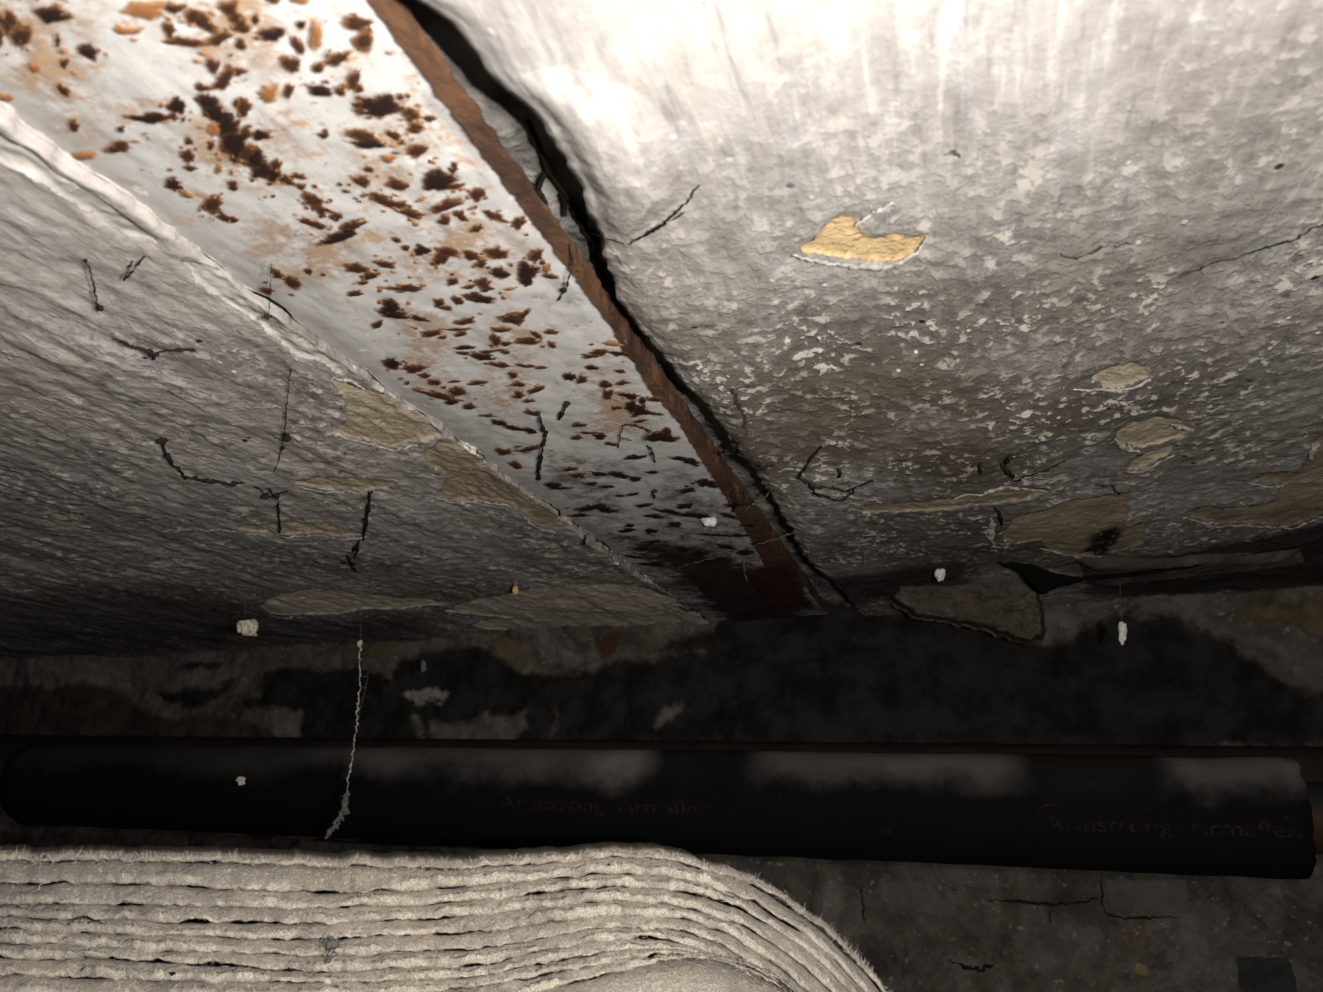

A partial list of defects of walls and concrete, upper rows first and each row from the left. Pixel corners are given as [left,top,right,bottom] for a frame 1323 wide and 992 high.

corrosion [0,0,109,101]
peeling [793,202,928,271]
crack [1186,224,1323,275]
corrosion [73,0,826,622]
crack [2,106,706,619]
peeling [181,260,571,533]
crack [730,384,768,437]
peeling [1113,416,1194,474]
peeling [844,486,1146,577]
damp [0,601,1323,747]
flaking render [886,568,1046,645]
flaking render [1118,616,1127,645]